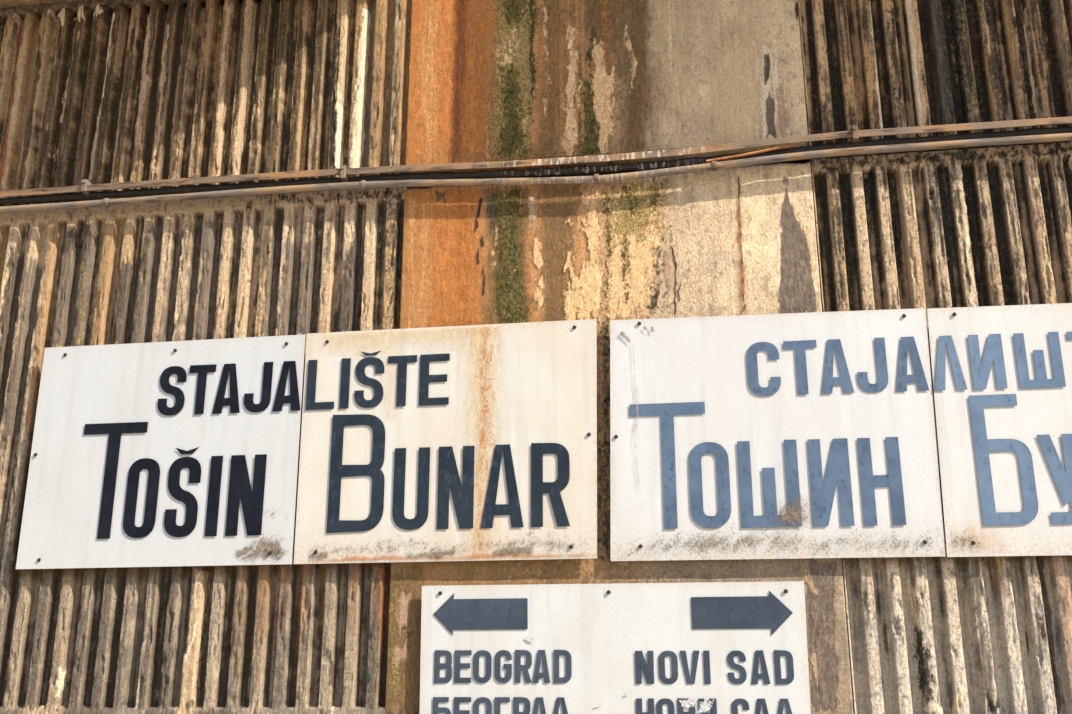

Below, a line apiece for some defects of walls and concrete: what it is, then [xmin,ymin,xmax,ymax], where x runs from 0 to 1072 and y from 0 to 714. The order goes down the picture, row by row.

water stain [88,12,115,182]
water stain [232,0,257,175]
water stain [348,2,376,168]
corrosion [377,0,491,166]
peeling [539,3,617,156]
water stain [869,0,1007,136]
water stain [0,246,42,440]
water stain [50,215,98,348]
water stain [111,218,221,344]
water stain [248,221,320,337]
water stain [330,187,405,332]
water stain [926,153,978,307]